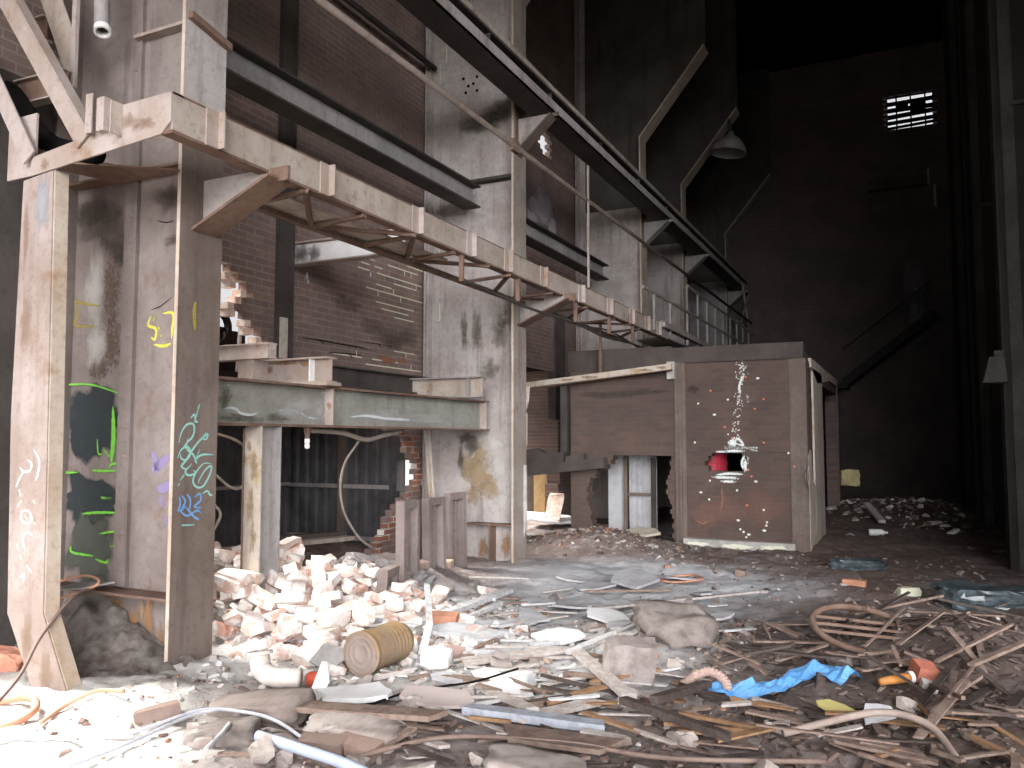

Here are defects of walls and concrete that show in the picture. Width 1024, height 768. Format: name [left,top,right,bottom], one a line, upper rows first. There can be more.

crack [302,337,396,358]
water stain [458,434,476,468]